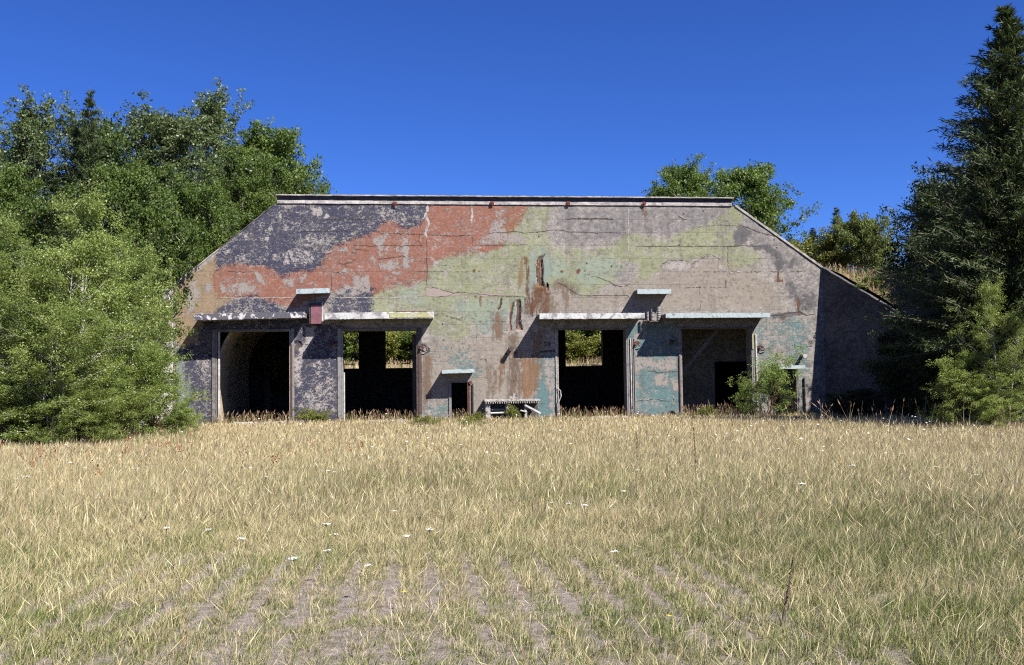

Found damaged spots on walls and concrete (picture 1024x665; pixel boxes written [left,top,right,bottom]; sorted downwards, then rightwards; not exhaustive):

peeling [294,324,336,414]
peeling [335,229,414,297]
corrosion [488,257,555,398]
crack [303,206,801,370]
peeling [630,321,680,415]